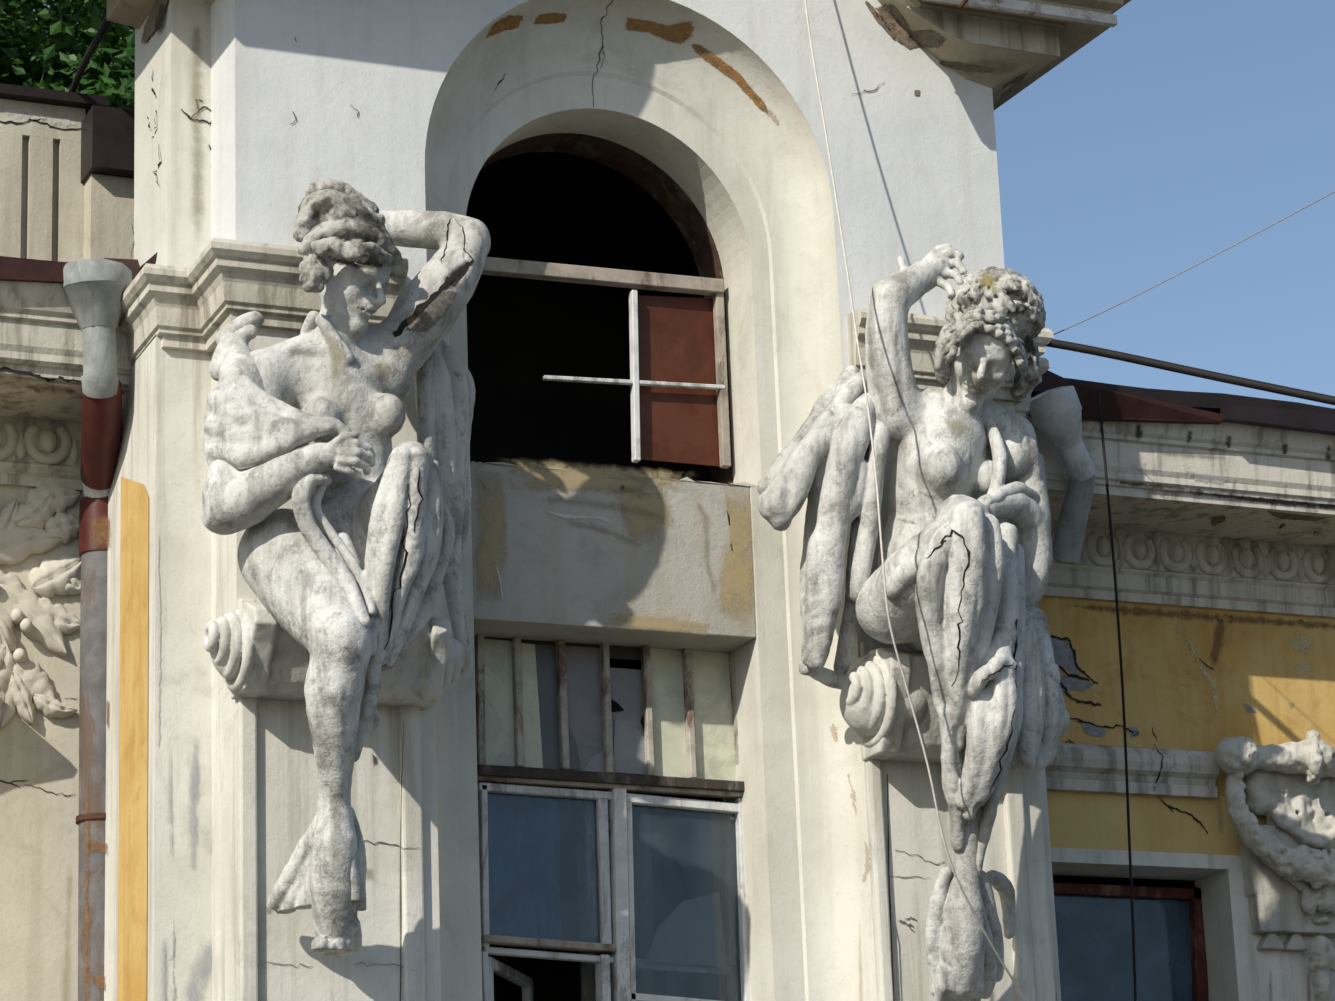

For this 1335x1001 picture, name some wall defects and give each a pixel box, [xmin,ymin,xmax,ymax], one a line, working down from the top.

peeling [625,18,778,124]
spalling [865,1,946,49]
crack [147,73,211,185]
crack [392,219,474,337]
corrosion [93,518,110,546]
crack [384,468,424,650]
peeling [517,461,671,535]
peeling [721,501,753,611]
crack [928,529,1018,795]
leakage [190,753,198,861]
corrosion [83,801,106,1001]
leakage [187,946,211,1001]